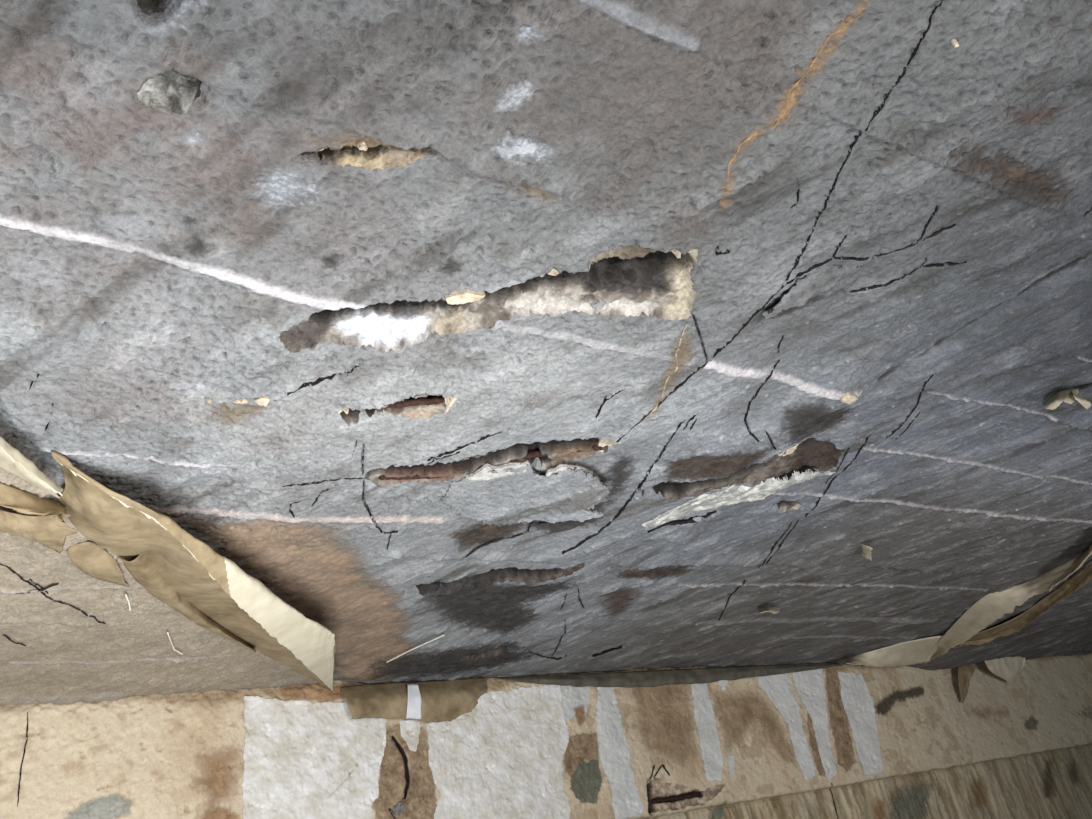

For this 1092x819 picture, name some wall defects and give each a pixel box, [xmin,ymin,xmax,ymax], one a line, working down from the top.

rust [722,12,864,204]
crack [616,0,967,450]
spalling [280,244,699,353]
crack [0,564,106,624]
peeling [0,436,336,692]
crack [283,440,398,551]
damp [371,572,571,679]
spalling [365,438,617,486]
crack [562,415,697,555]
crack [647,510,717,533]
spalling [642,438,845,527]
peeling [826,544,1092,771]